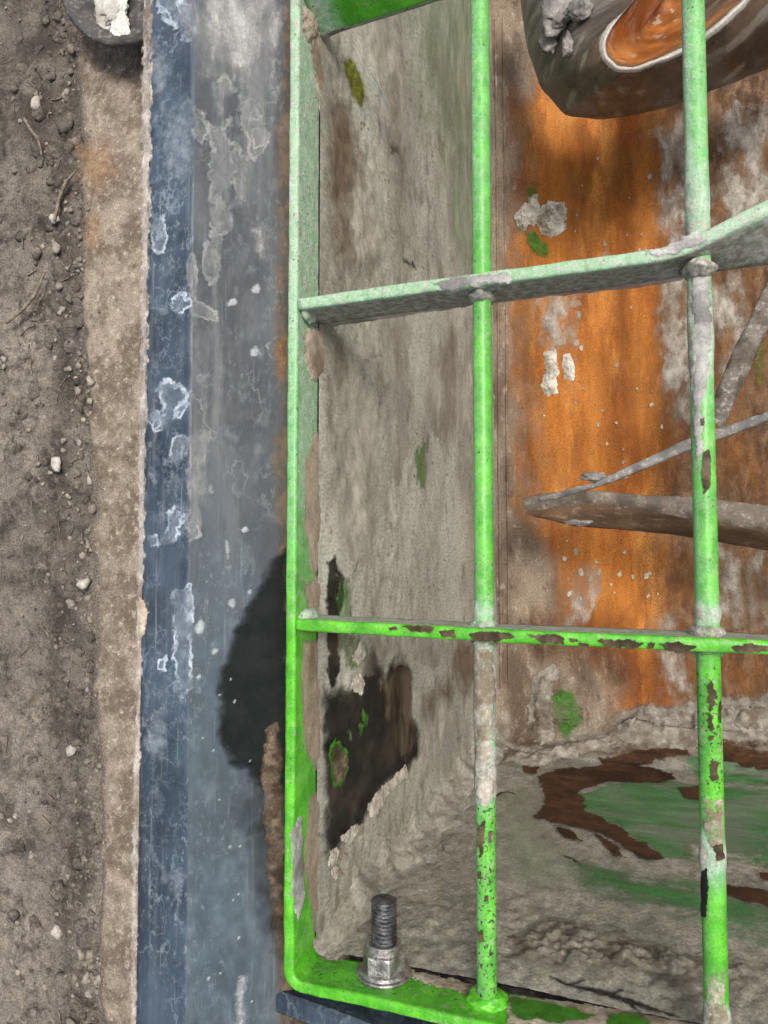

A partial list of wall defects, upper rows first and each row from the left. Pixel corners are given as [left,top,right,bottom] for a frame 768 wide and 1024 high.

damp [159,0,184,27]
damp [210,0,278,67]
corrosion [509,87,667,268]
damp [159,378,189,419]
corrosion [514,285,671,495]
peeling [326,556,344,616]
corrosion [543,519,664,630]
corrosion [622,648,672,711]
peeling [707,679,722,741]
peeling [323,633,420,881]
corrosion [260,723,285,934]
peeling [700,868,709,918]